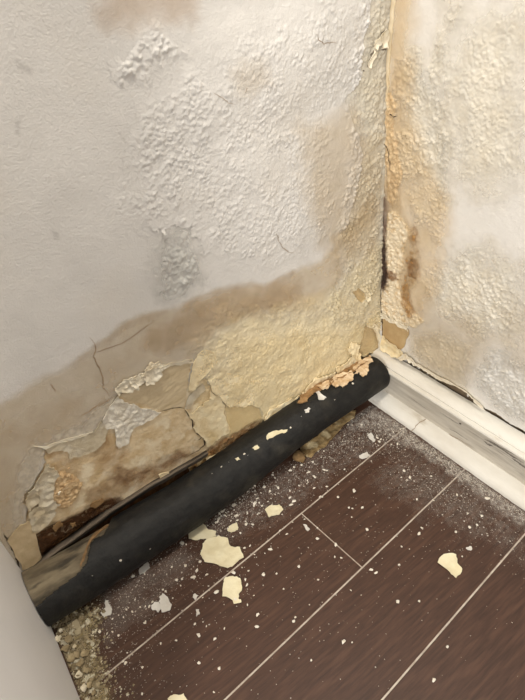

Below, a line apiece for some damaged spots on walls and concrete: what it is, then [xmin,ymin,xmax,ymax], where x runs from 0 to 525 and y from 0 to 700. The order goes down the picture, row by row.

damp [380,62,432,328]
crack [82,325,148,416]
peeling [297,313,525,434]
peeling [7,350,264,570]
damp [37,498,122,555]